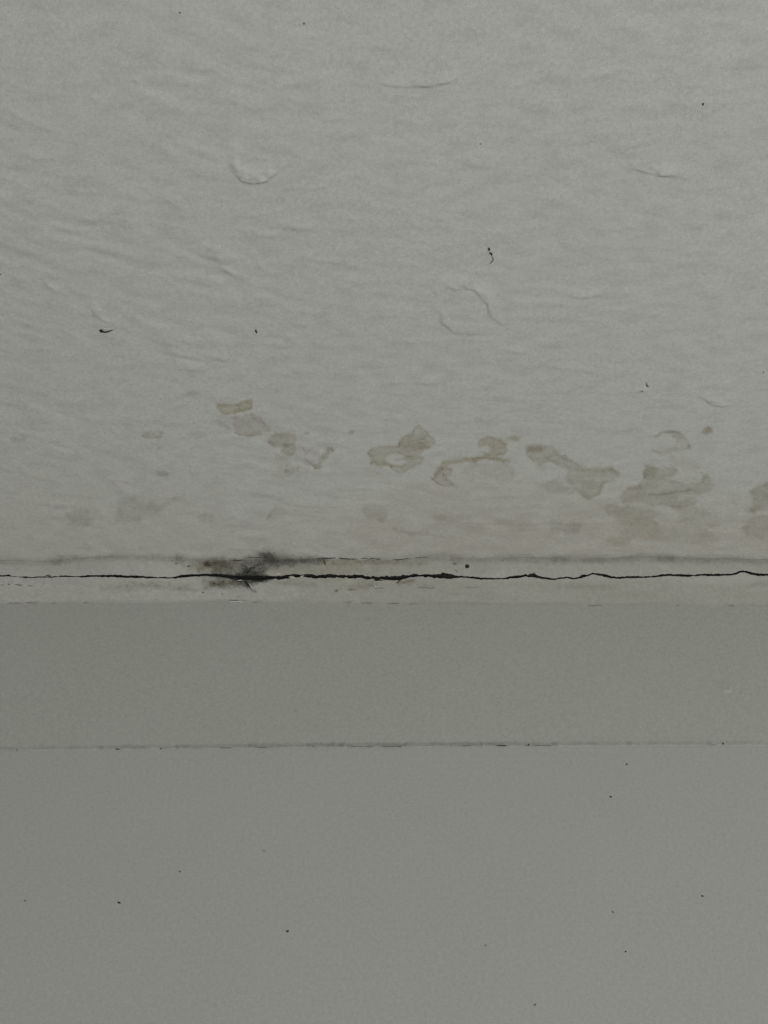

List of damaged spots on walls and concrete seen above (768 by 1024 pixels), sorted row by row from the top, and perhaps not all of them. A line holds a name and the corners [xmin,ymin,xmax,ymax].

crack [0,557,768,604]